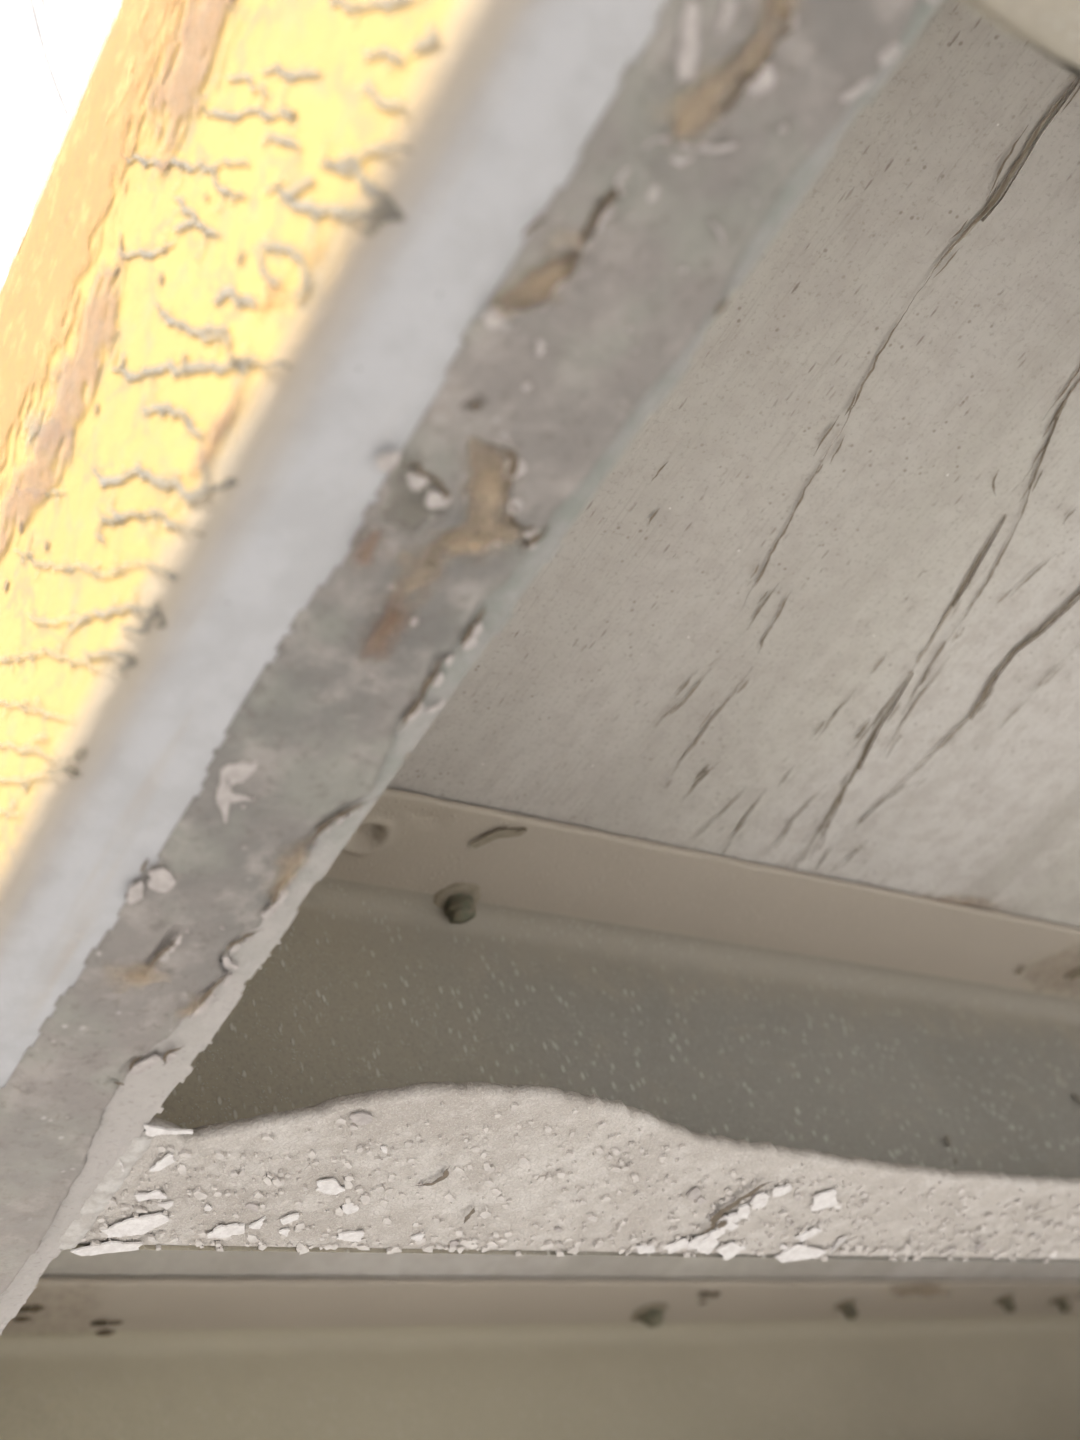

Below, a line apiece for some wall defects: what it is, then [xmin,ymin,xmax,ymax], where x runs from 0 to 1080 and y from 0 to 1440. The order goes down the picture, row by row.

peeling [644,0,796,165]
peeling [482,168,631,348]
peeling [376,451,467,511]
peeling [465,427,548,551]
crack [649,463,667,523]
crack [659,77,1080,872]
peeling [216,761,277,824]
peeling [470,827,527,848]
peeling [127,868,176,905]
peeling [222,954,239,970]
peeling [127,1052,177,1075]
peeling [70,1103,1080,1264]